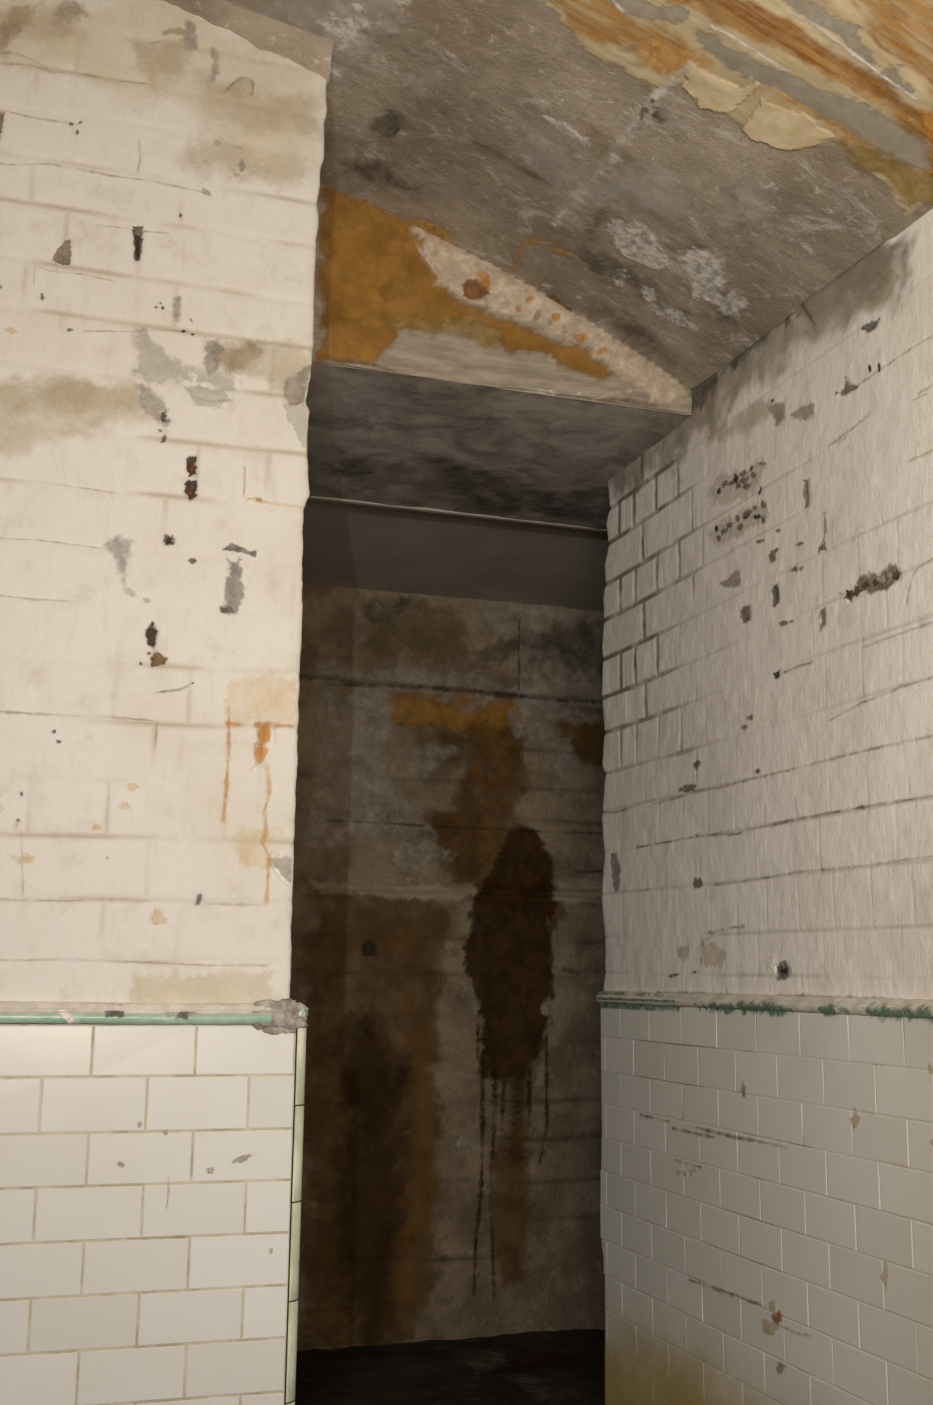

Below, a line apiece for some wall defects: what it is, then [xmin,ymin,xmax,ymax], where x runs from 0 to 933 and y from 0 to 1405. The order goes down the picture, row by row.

peeling [544,0,933,216]
corrosion [317,187,612,379]
damp [112,328,188,443]
spalling [284,365,311,446]
damp [611,317,792,492]
spalling [220,543,256,613]
flaking render [710,462,780,563]
spalling [840,565,901,601]
corrosion [254,723,282,763]
damp [306,600,496,871]
damp [479,601,604,740]
damp [463,828,556,1294]